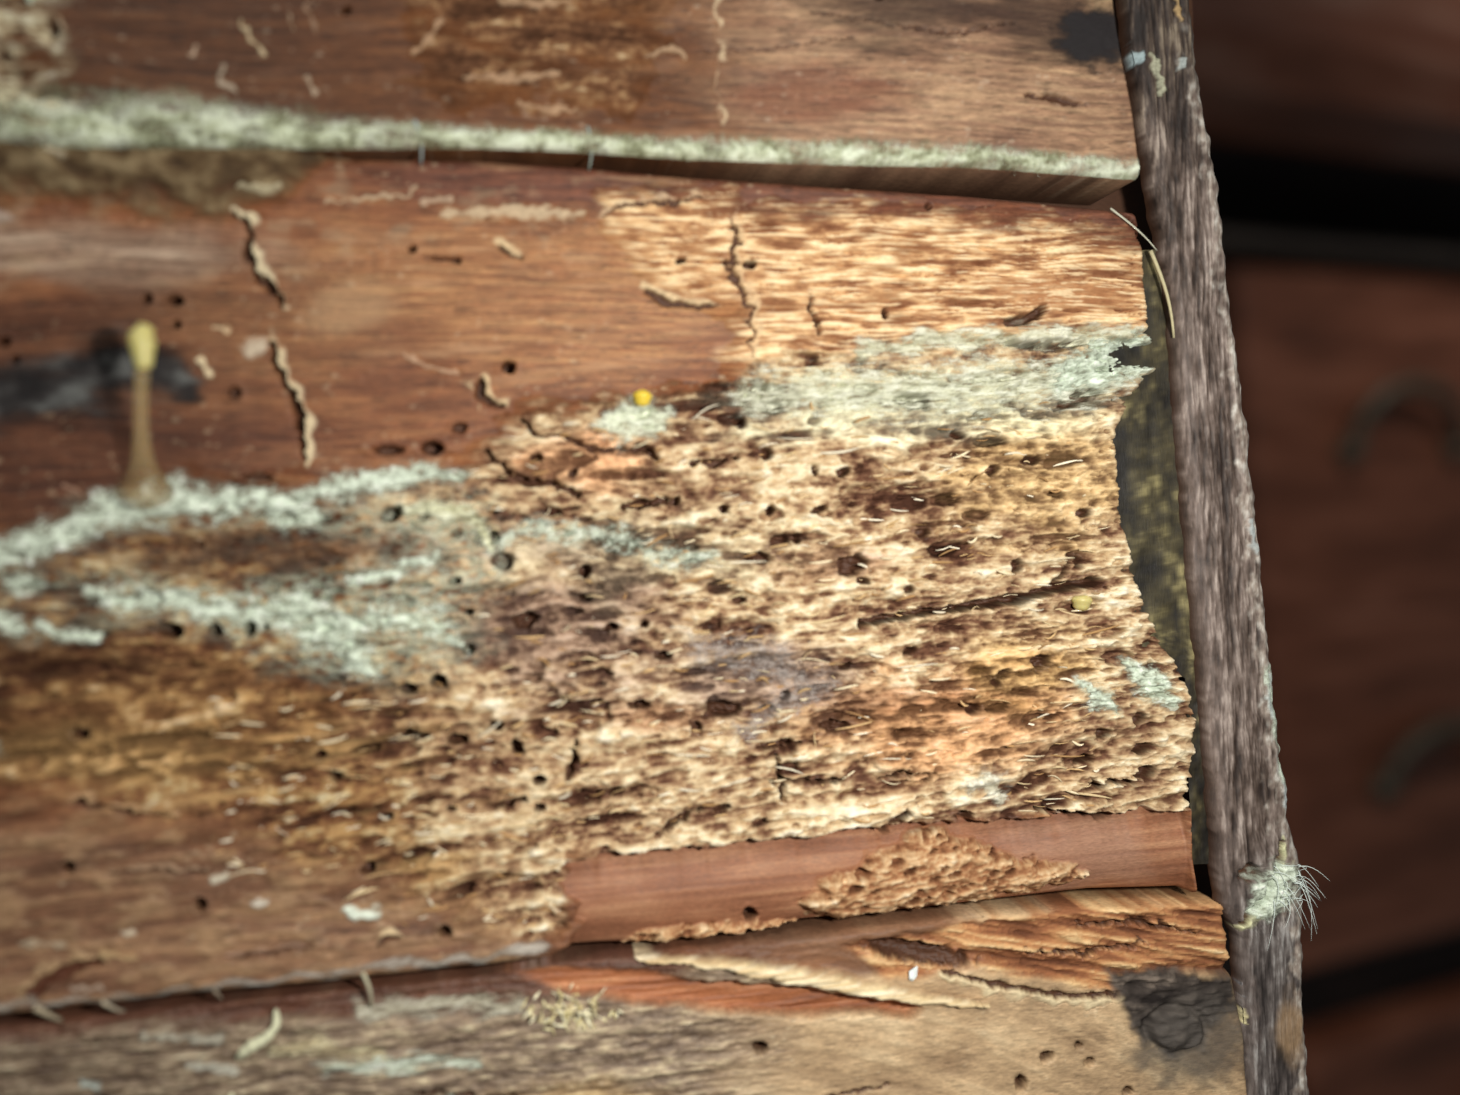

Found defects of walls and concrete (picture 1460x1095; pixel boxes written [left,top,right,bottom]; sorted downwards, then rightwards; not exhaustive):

crack [702,0,1009,126]
water stain [854,0,1122,68]
water stain [437,199,588,226]
crack [598,187,765,357]
water stain [0,345,201,422]
crack [229,205,318,469]
water stain [591,396,675,445]
water stain [728,322,1152,419]
water stain [0,462,719,597]
water stain [0,611,103,643]
water stain [82,585,470,677]
spalling [836,904,1230,993]